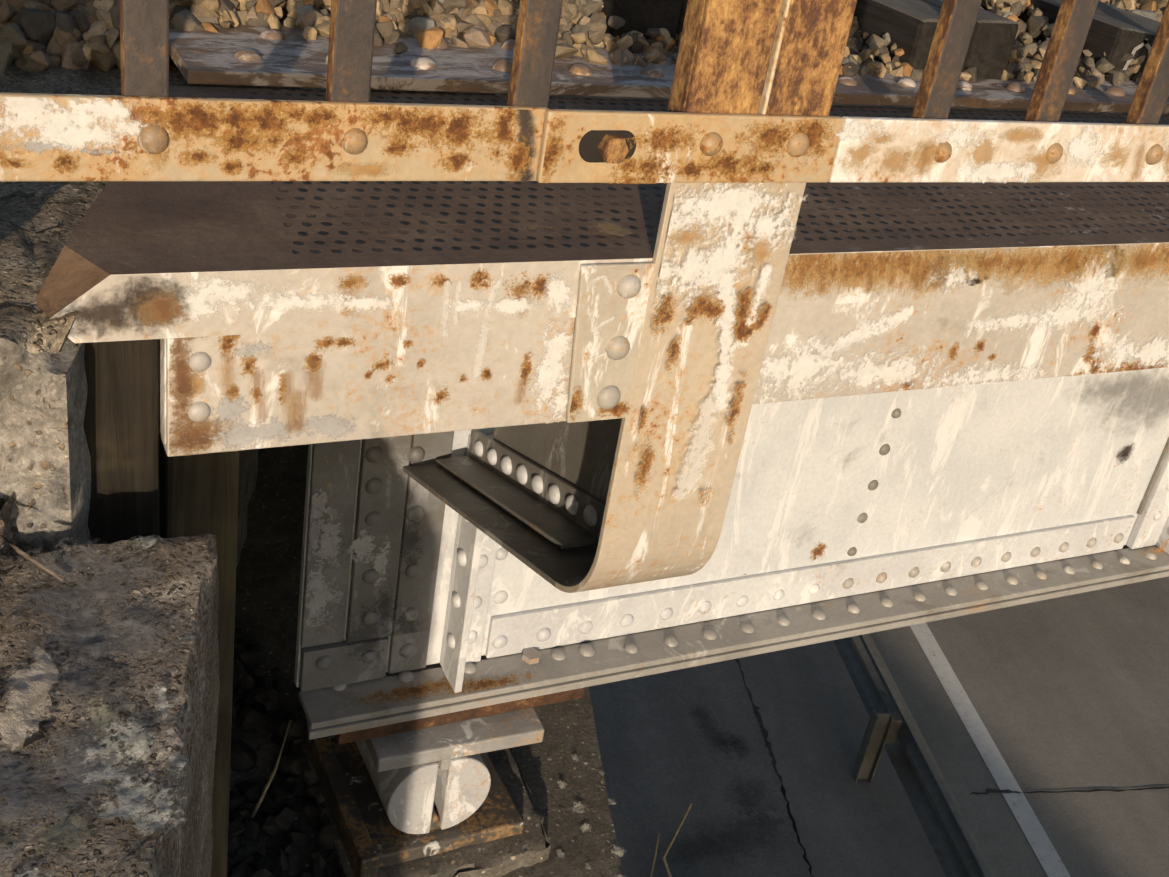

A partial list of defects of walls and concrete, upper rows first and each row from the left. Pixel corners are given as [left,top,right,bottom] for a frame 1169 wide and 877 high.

rust [141,101,338,175]
rust [340,106,564,182]
rust [610,119,835,184]
crack [0,302,42,323]
rust [169,337,234,456]
rust [219,335,262,403]
rust [303,337,355,372]
rust [505,273,551,300]
rust [651,288,773,372]
rust [1074,323,1168,376]
rust [599,402,656,496]
spalling [0,645,61,752]